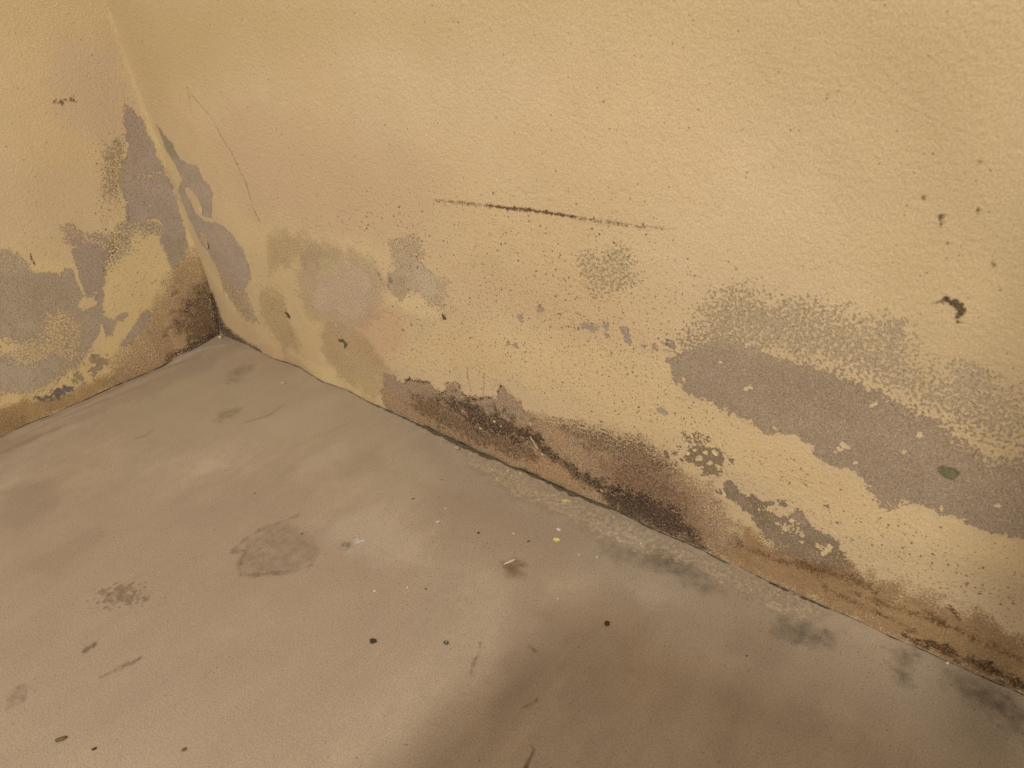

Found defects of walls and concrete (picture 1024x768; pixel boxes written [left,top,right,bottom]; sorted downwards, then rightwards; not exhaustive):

peeling [0,101,259,396]
damp [0,250,261,435]
peeling [387,234,452,320]
damp [323,324,823,621]
peeling [664,431,852,570]
peeling [580,279,1024,539]
damp [902,634,1024,690]